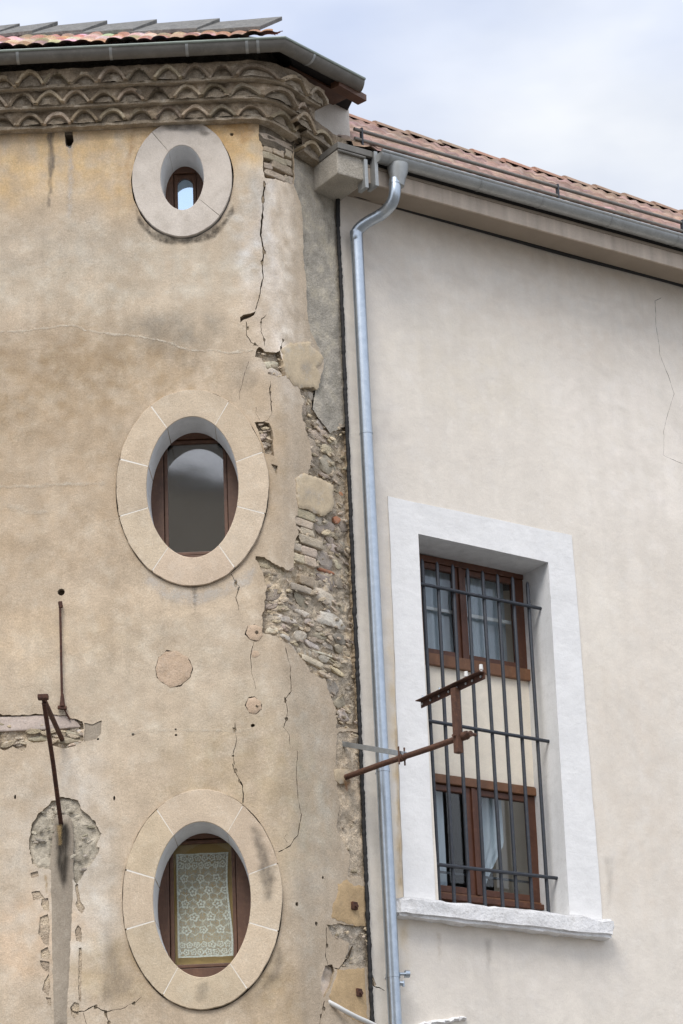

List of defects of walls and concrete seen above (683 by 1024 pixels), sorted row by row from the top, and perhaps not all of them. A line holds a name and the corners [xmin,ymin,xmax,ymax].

crack [239,181,284,422]
flaking render [254,133,364,879]
flaking render [0,714,102,752]
crack [232,727,244,802]
crack [279,648,302,852]
flaking render [29,797,101,913]
flaking render [32,891,51,1006]
flaking render [70,926,82,1019]
flaking render [315,922,376,997]